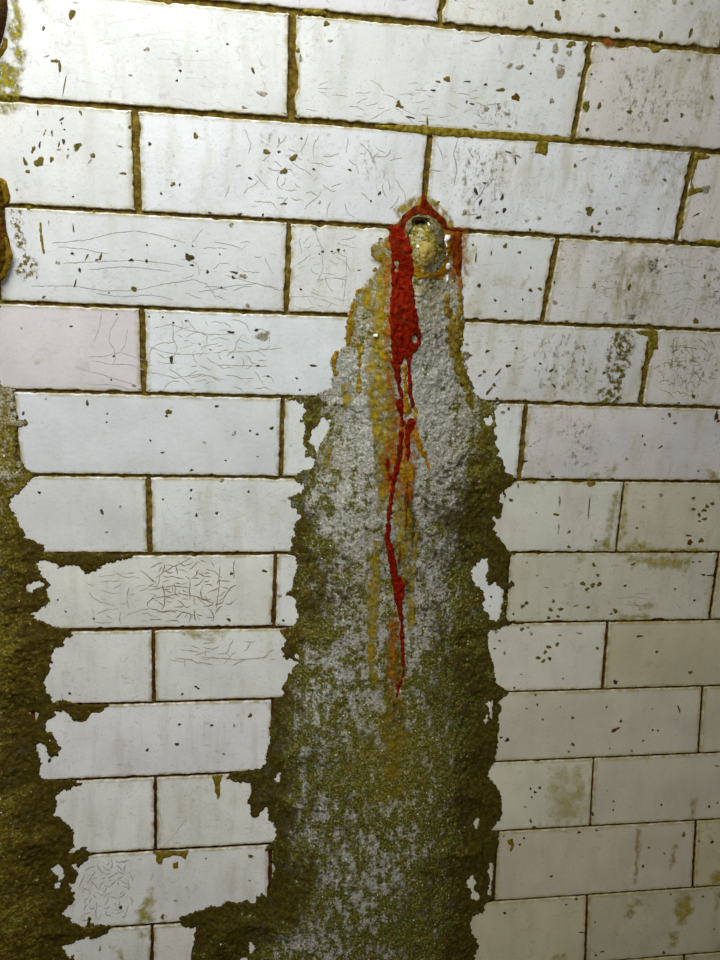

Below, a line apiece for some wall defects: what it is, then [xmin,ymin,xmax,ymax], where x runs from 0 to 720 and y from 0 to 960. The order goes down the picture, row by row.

leakage [0,381,135,960]
leakage [179,206,524,960]
corrosion [331,192,477,792]